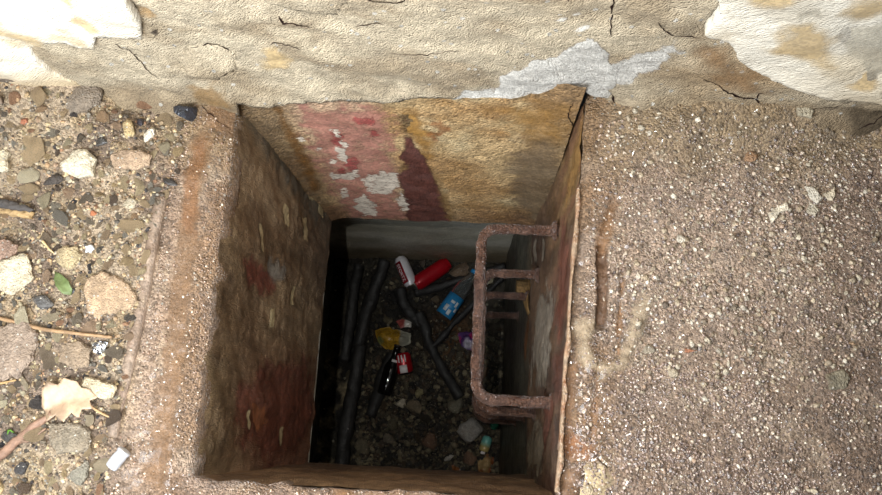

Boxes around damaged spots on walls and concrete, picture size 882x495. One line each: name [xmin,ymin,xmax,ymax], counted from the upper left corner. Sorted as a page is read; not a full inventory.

crack [360,0,405,26]
crack [608,0,616,35]
leakage [851,3,882,17]
leakage [777,27,824,59]
crack [702,78,763,103]
spalling [32,0,882,219]